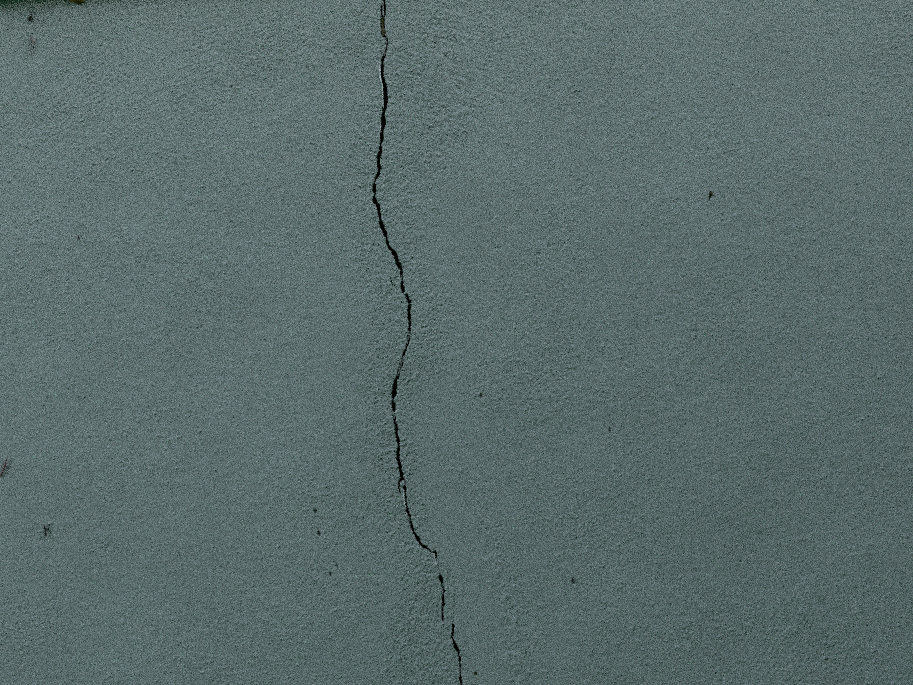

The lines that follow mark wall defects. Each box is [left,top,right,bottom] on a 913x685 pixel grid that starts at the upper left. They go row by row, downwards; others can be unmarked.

crack [364,0,462,685]